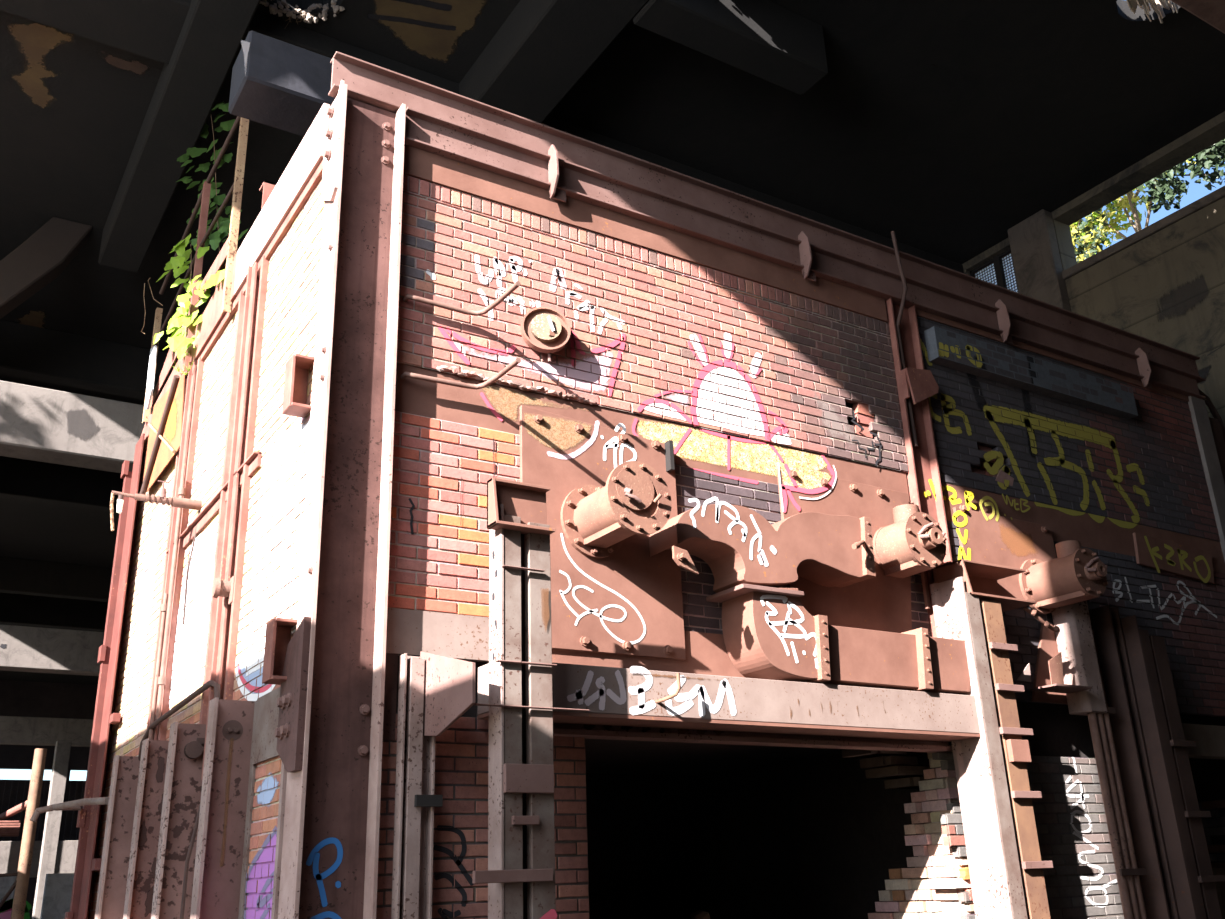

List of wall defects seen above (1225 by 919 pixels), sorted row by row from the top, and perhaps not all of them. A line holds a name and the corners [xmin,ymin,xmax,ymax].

peeling [368,0,486,61]
peeling [7,22,73,108]
peeling [102,51,150,75]
spalling [851,402,874,439]